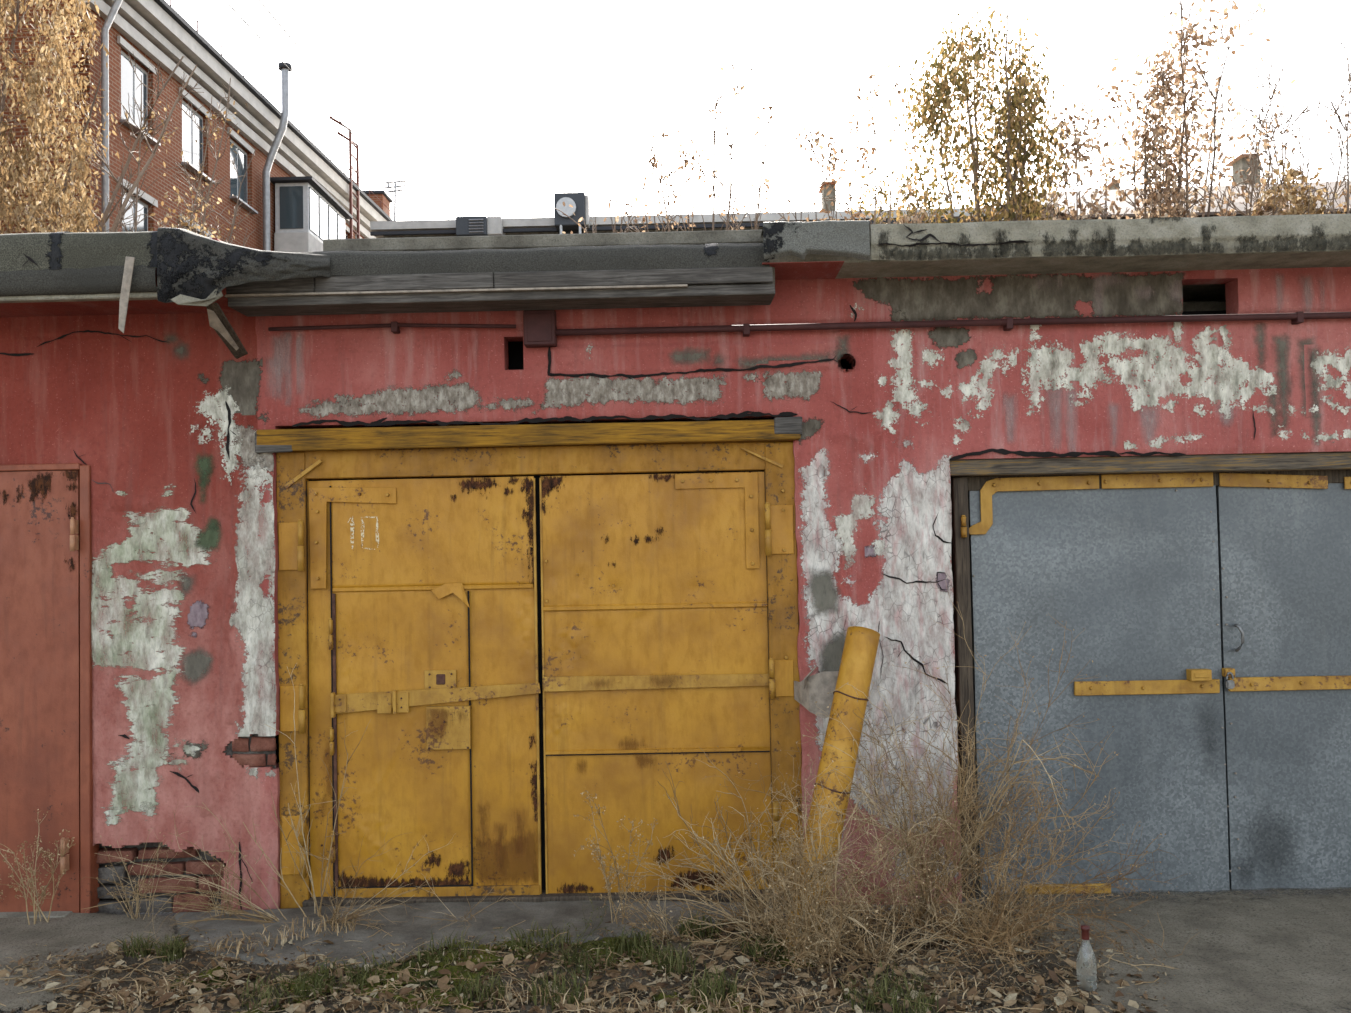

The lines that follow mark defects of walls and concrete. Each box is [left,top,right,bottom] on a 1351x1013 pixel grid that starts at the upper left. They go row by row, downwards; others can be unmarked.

crack [0,330,170,356]
crack [547,347,839,380]
crack [292,411,798,427]
corrosion [0,470,78,521]
peeling [190,358,276,779]
peeling [797,272,1351,833]
peeling [91,484,211,826]
flaking render [96,842,226,914]